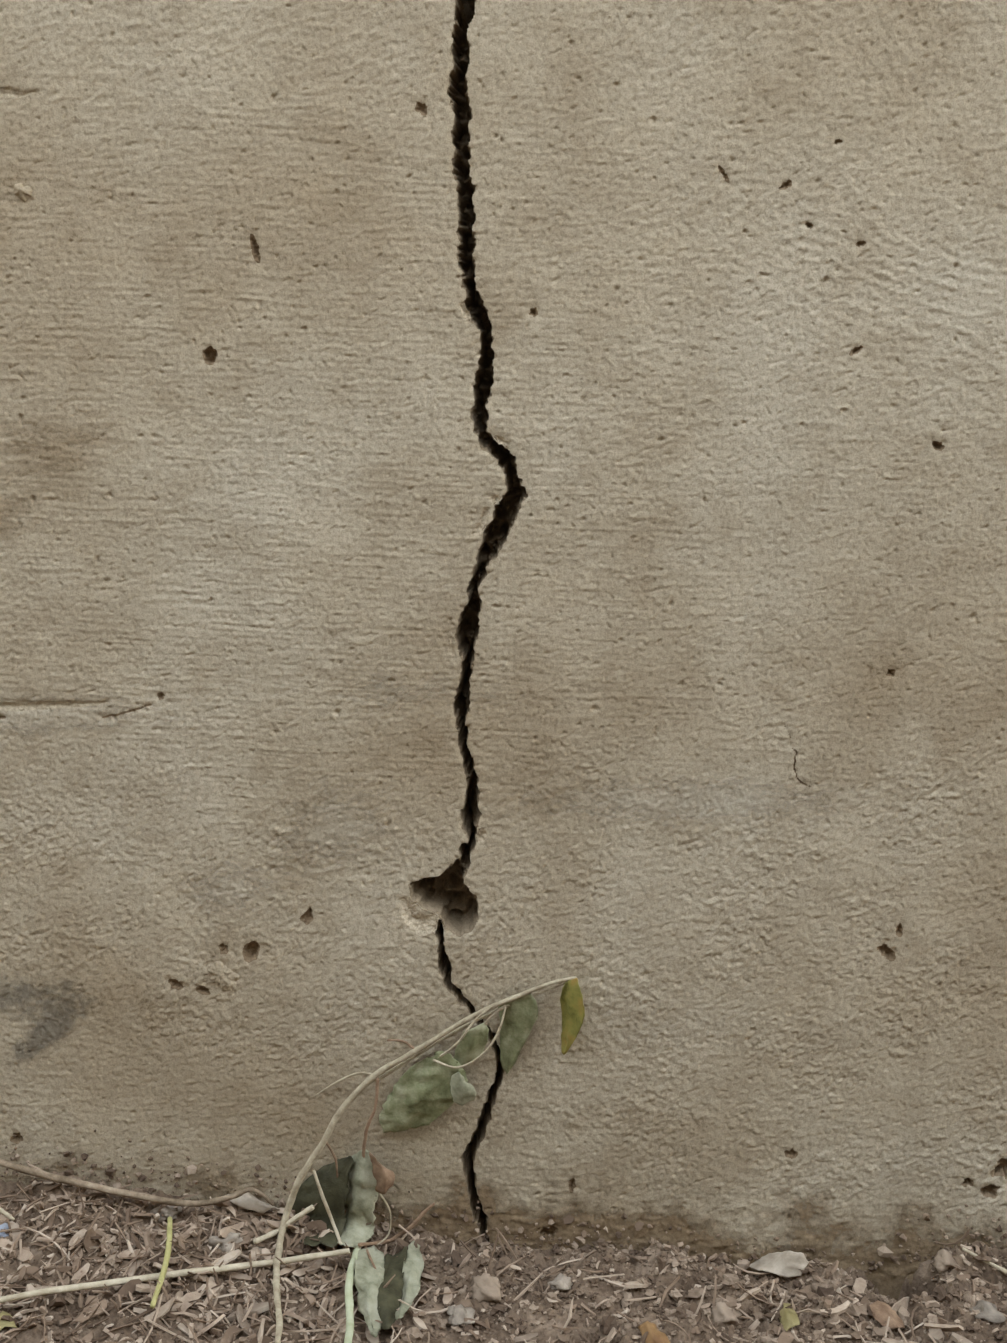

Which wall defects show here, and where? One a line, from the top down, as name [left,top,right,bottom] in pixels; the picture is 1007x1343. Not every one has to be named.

crack [447,0,528,878]
crack [433,917,505,1242]